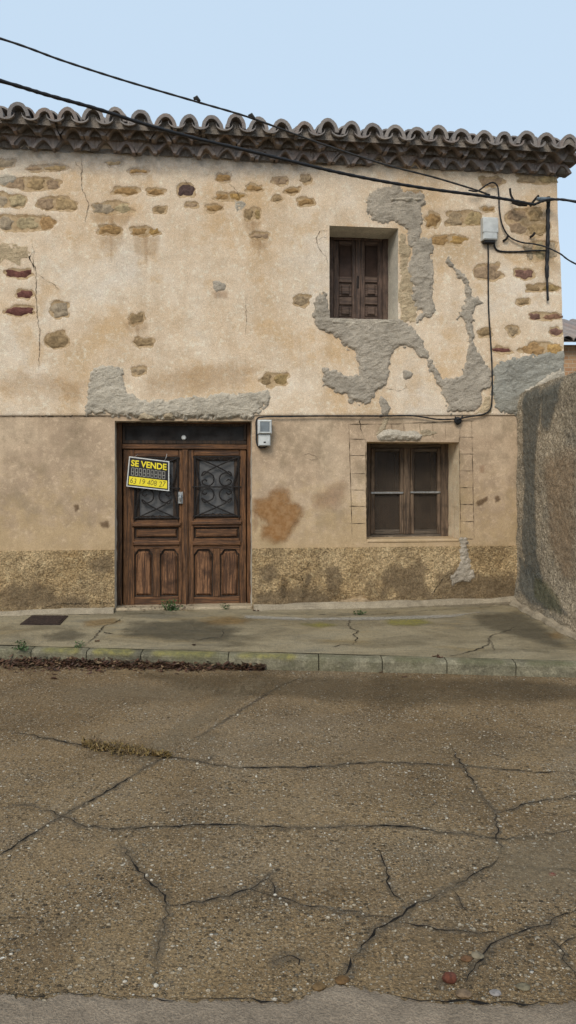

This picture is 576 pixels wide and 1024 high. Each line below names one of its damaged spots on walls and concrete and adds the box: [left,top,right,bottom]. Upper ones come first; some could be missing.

crack [29,246,57,367]
spalling [130,365,147,377]